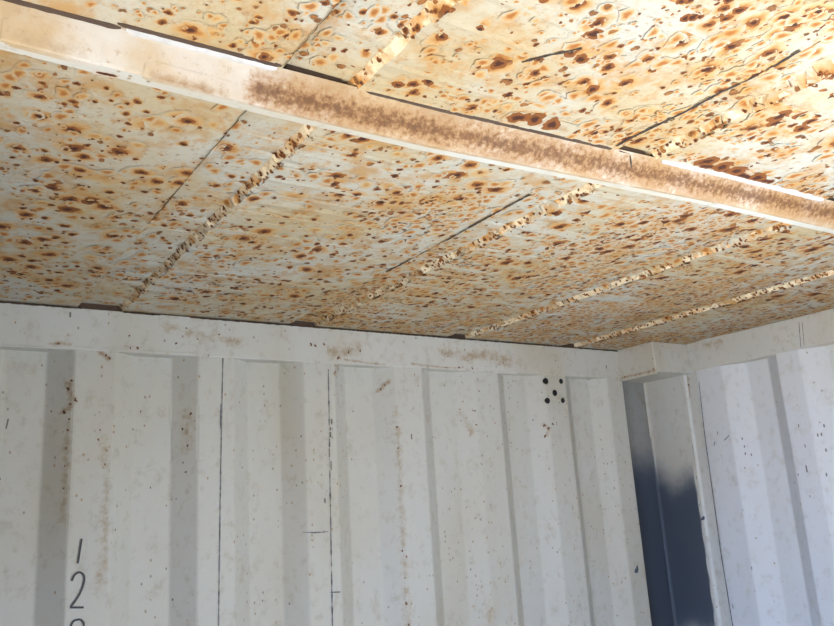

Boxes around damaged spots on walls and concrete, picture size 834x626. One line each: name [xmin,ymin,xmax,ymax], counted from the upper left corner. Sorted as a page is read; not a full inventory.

rust [0,0,834,374]